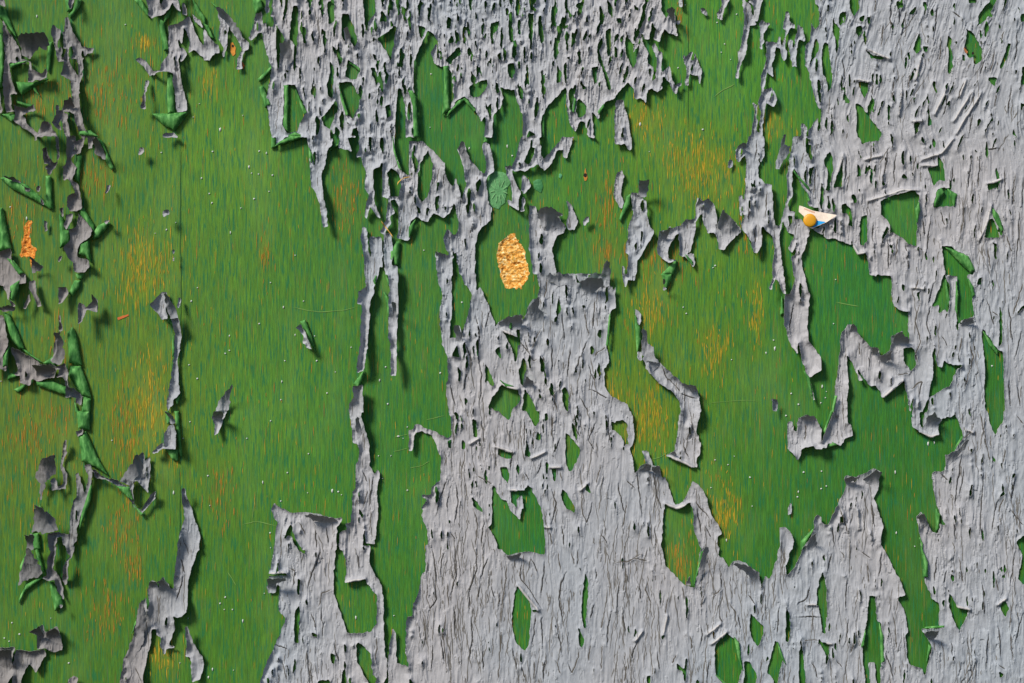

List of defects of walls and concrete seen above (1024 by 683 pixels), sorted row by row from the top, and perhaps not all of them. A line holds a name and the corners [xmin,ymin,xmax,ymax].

peeling [136,0,249,112]
peeling [0,0,106,273]
peeling [257,0,446,376]
peeling [0,248,83,405]
peeling [435,0,1024,562]
peeling [18,292,182,608]
peeling [0,625,63,683]
peeling [120,488,204,683]
peeling [318,643,377,683]
peeling [633,503,709,618]
peeling [714,563,806,683]
peeling [805,533,890,683]